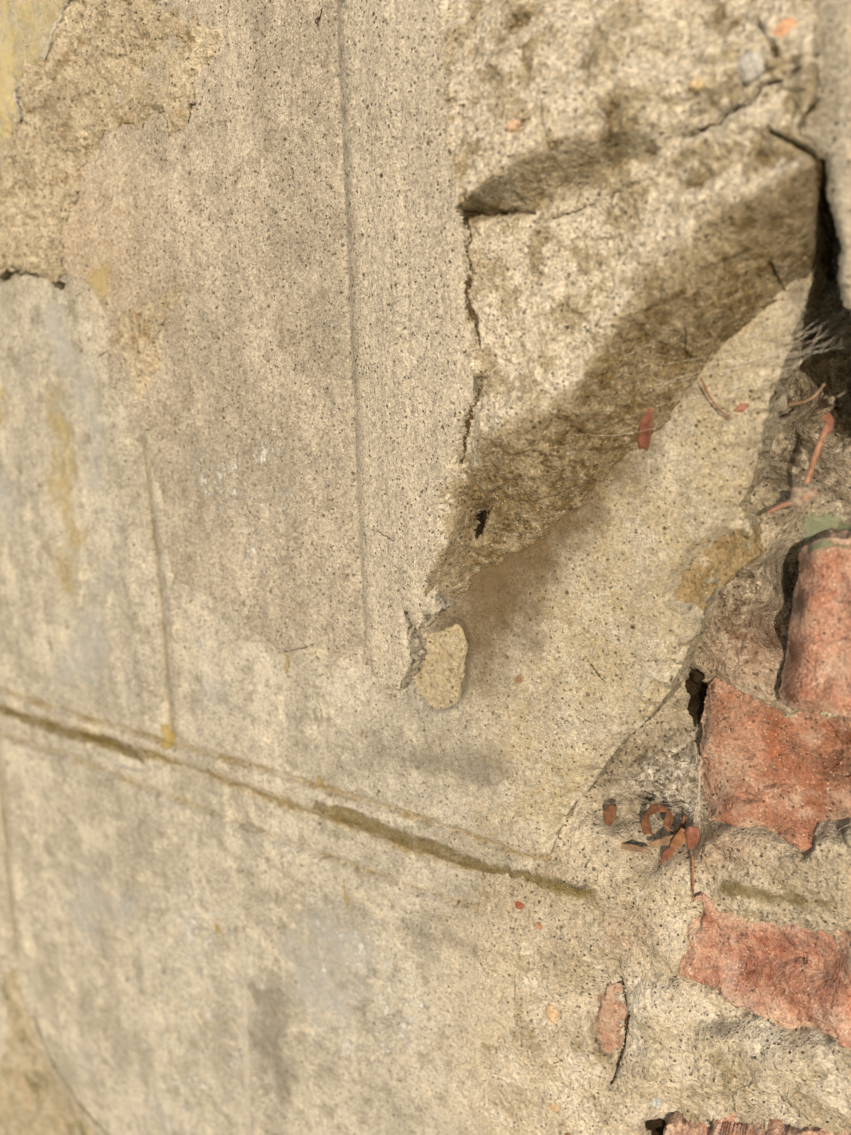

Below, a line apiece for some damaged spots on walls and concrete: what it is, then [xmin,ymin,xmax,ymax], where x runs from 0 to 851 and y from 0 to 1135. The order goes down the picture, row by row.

spalling [0,0,227,288]
crack [683,42,800,139]
spalling [112,281,189,399]
crack [459,378,483,464]
crack [458,180,645,347]
spalling [425,0,851,1135]